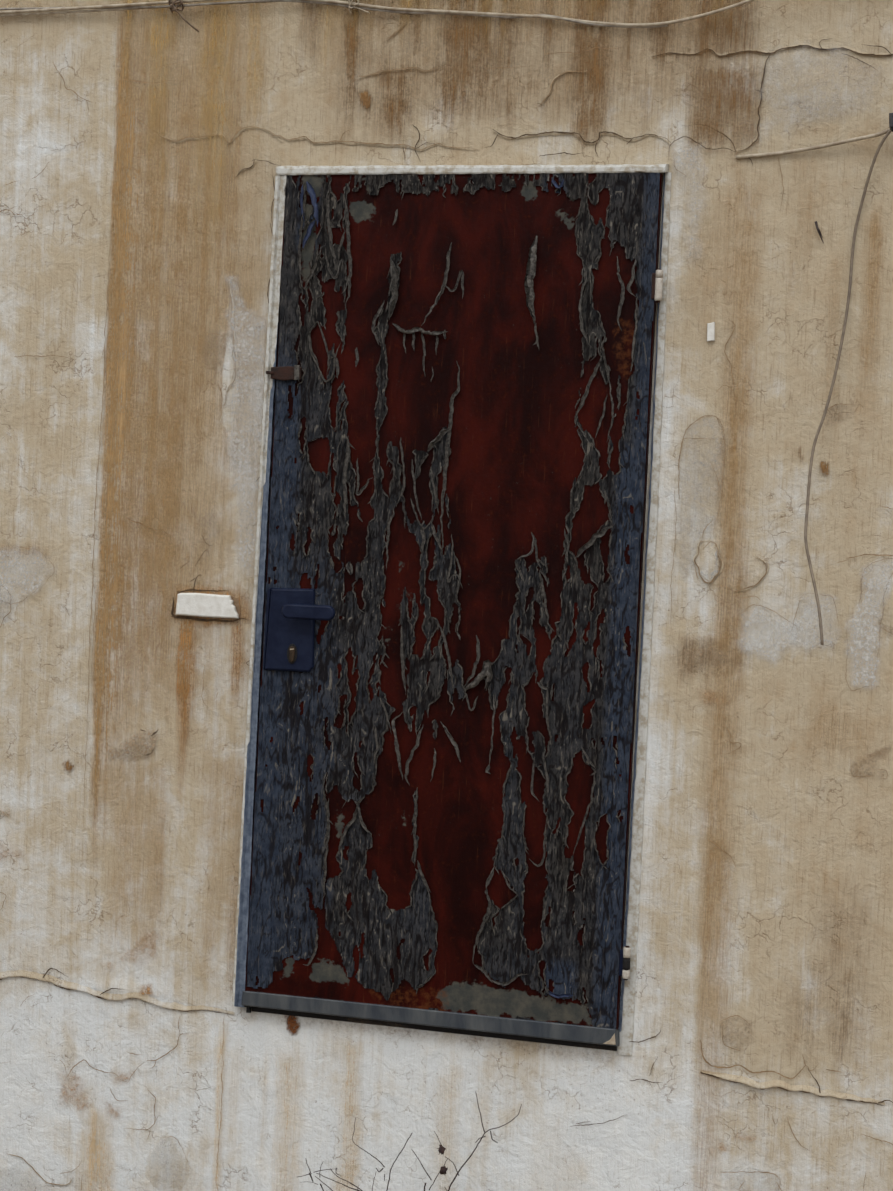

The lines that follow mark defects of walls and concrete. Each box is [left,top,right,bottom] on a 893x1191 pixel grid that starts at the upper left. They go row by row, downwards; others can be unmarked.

water stain [346,0,358,89]
water stain [442,0,511,107]
crack [133,38,893,232]
water stain [575,0,607,138]
water stain [693,67,753,142]
water stain [700,0,748,52]
water stain [94,0,171,802]
crack [213,279,270,421]
crack [14,226,246,827]
peeling [227,173,660,1029]
crack [0,968,235,1190]
corrosion [287,1015,300,1035]